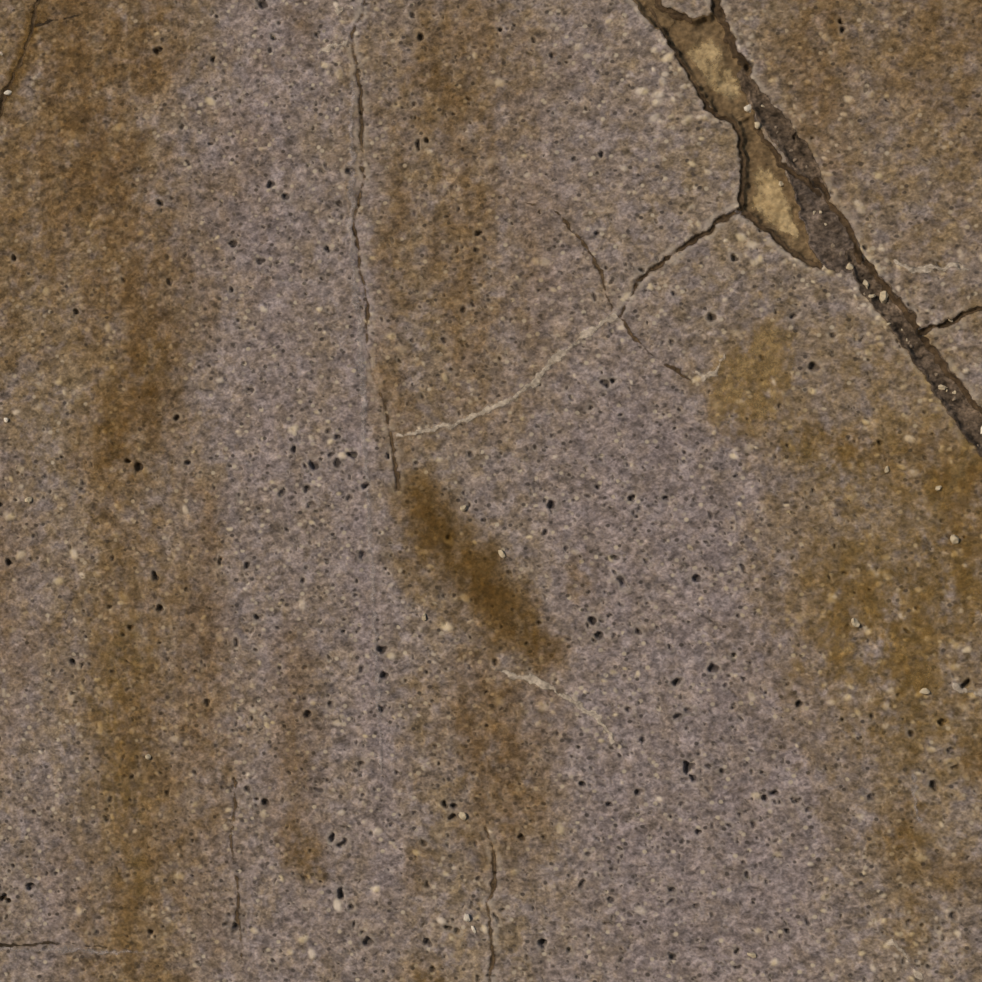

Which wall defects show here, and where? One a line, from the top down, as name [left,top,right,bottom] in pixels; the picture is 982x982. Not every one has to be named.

crack [0,0,79,117]
crack [350,0,370,359]
crack [527,0,982,457]
crack [379,393,400,490]
crack [485,827,497,982]